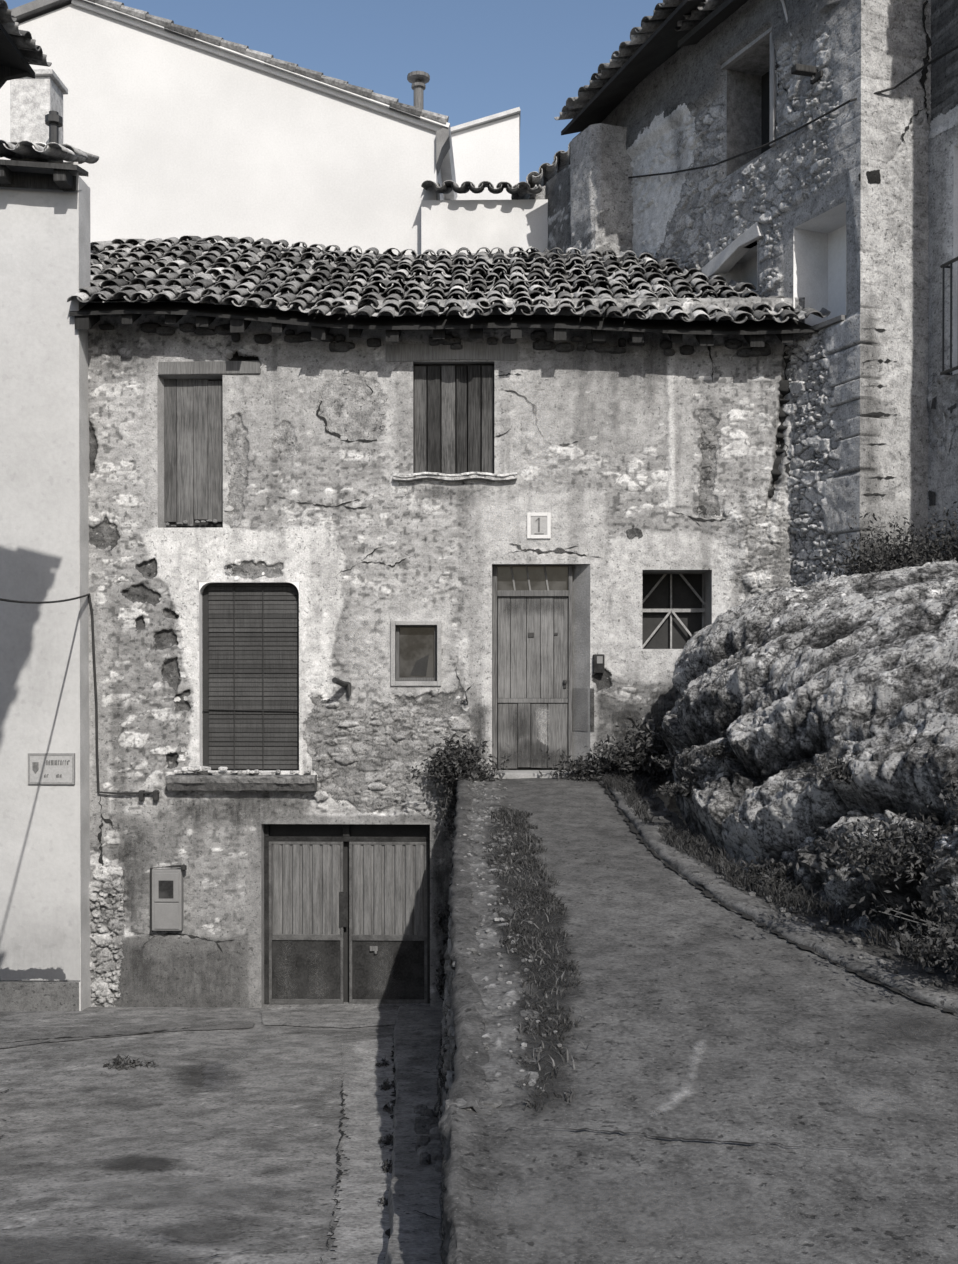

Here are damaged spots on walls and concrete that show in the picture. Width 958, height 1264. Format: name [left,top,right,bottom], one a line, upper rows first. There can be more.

crack [902,0,932,149]
spalling [858,169,881,183]
crack [768,345,792,498]
flaking render [89,517,122,551]
flaking render [121,558,191,711]
flaking render [166,732,189,769]